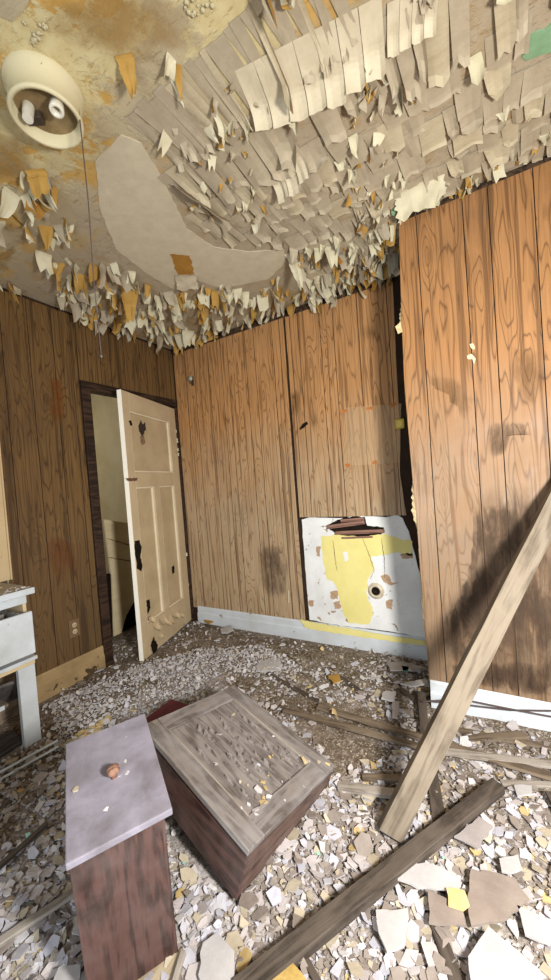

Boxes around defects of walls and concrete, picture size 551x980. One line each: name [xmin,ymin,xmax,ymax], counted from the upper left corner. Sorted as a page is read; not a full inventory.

flaking render [302,515,425,637]
damp [452,511,528,654]
damp [482,584,547,691]